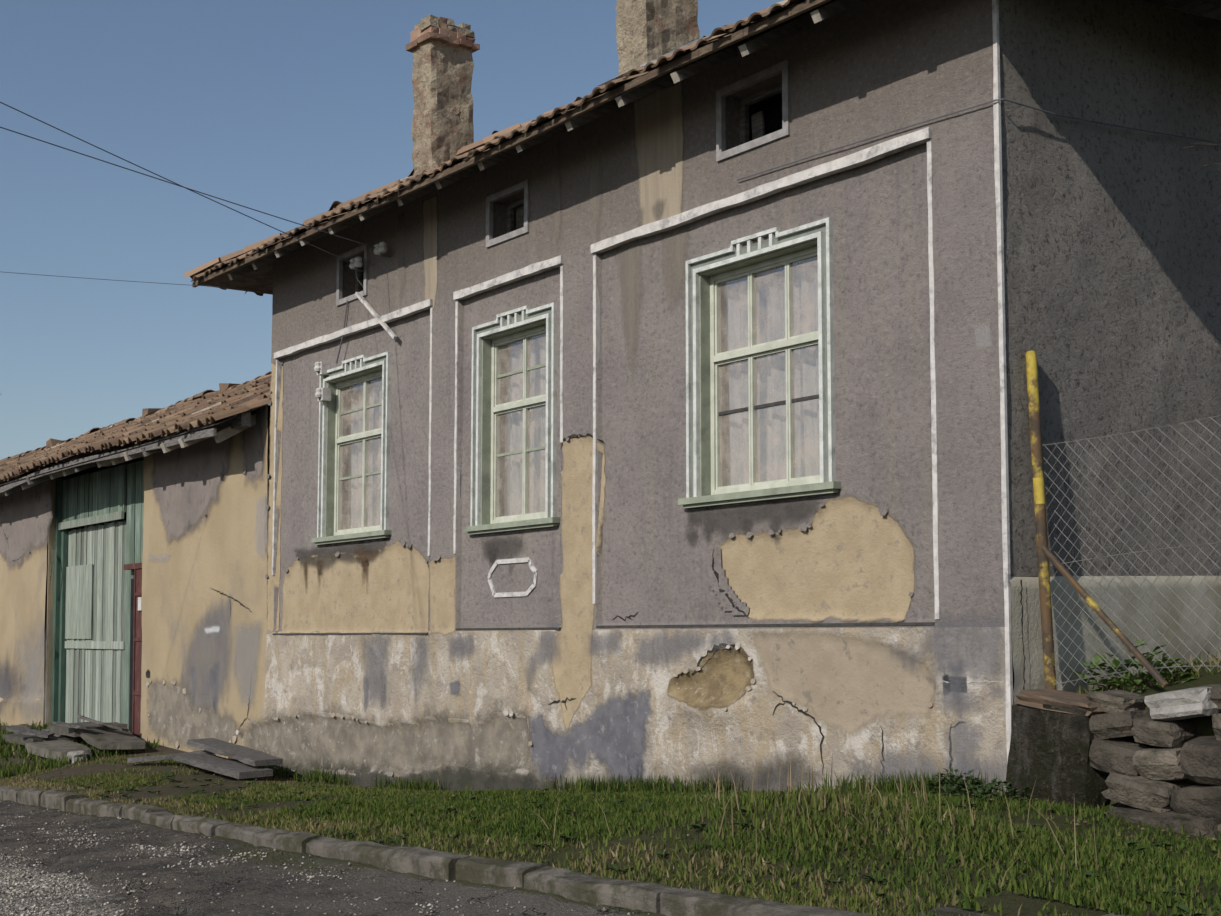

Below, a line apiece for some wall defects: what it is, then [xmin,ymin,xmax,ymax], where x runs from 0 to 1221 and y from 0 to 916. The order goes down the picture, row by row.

flaking render [0,479,52,566]
flaking render [152,360,456,635]
flaking render [551,433,606,730]
crack [712,550,748,617]
flaking render [708,497,915,622]
leakage [186,607,259,709]
flaking render [667,643,756,711]
leakage [263,692,651,791]
crack [773,691,824,774]